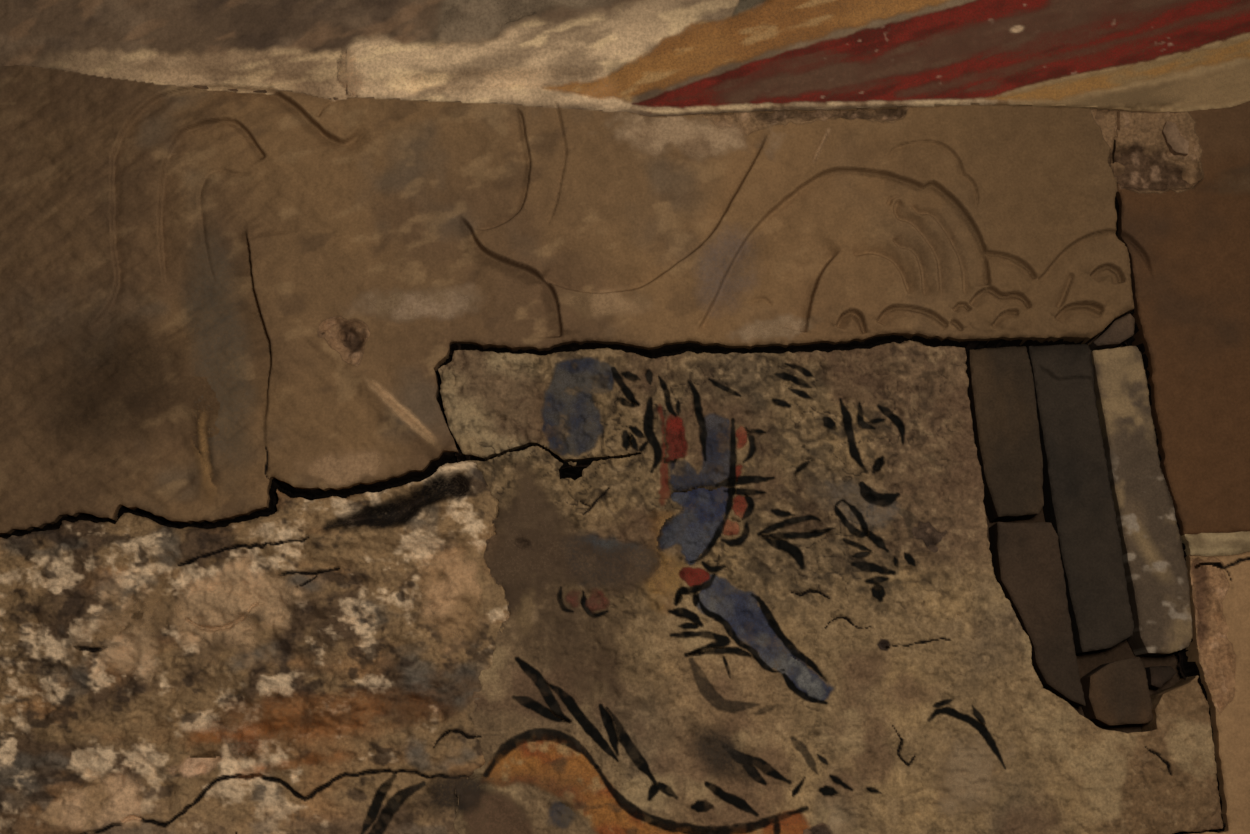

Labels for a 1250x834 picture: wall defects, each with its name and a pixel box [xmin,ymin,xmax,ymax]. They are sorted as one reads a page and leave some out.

spalling [1091,108,1203,193]
crack [0,335,1084,588]
crack [84,730,481,834]